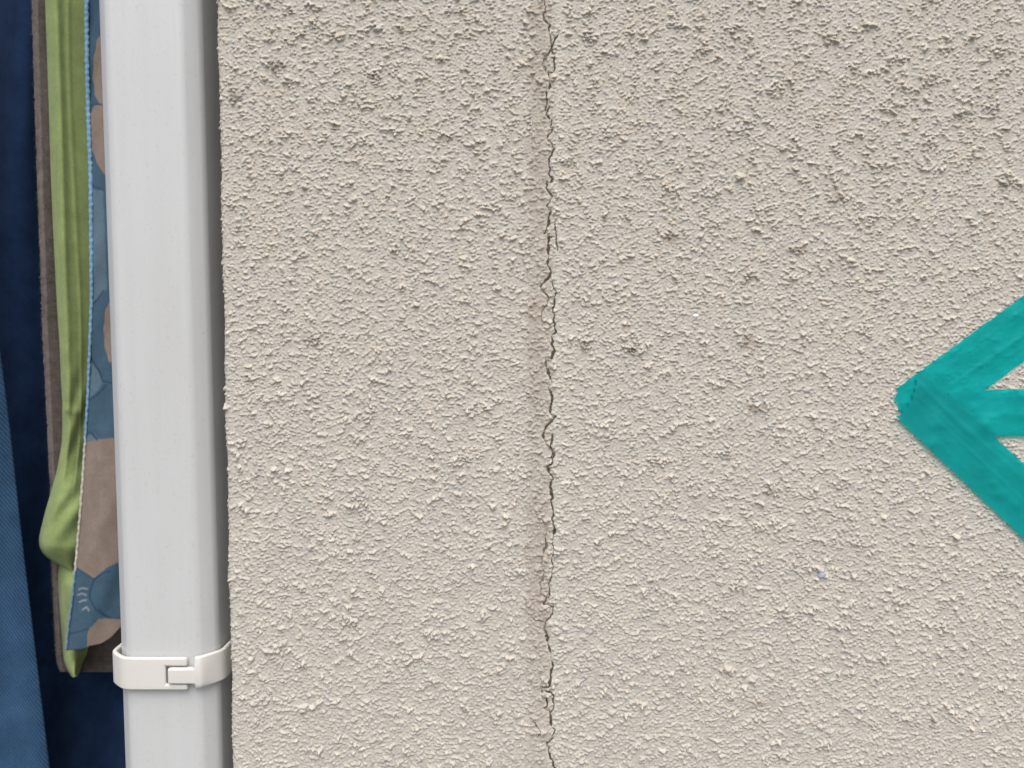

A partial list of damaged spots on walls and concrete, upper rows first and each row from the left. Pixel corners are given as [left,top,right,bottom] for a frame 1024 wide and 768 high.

crack [531,0,560,768]